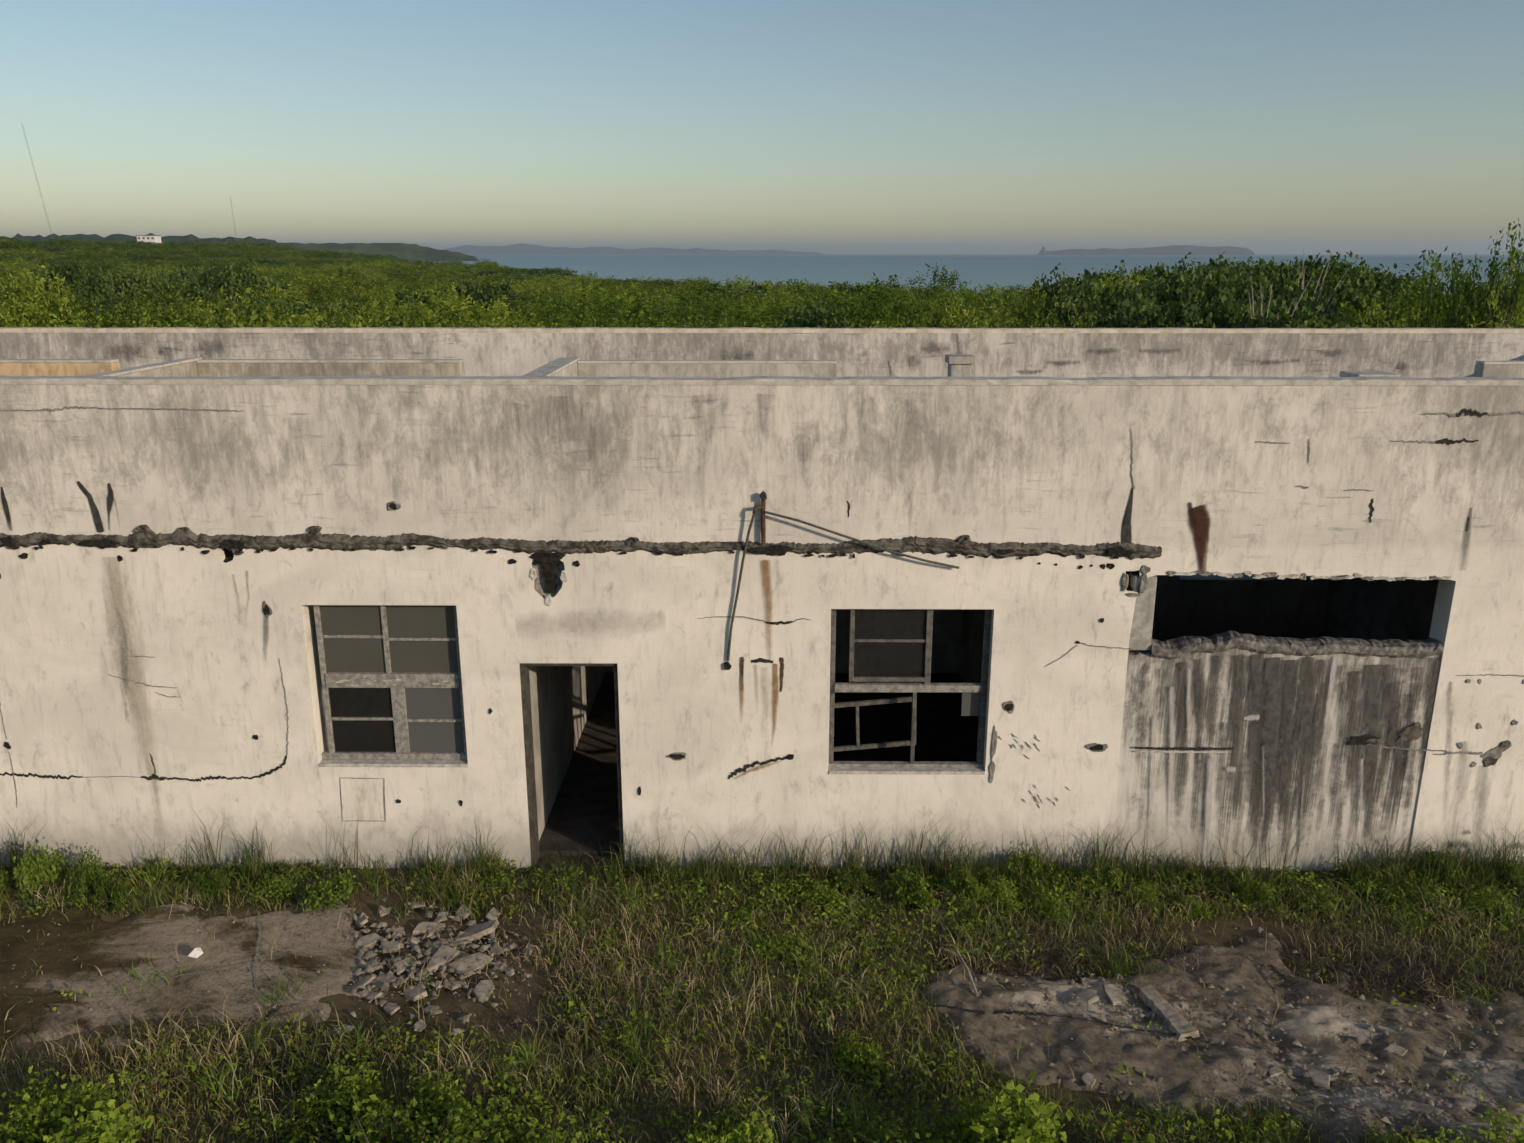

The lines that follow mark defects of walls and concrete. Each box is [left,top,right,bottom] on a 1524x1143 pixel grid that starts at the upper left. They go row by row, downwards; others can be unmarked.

crack [1389,408,1524,445]
spalling [0,525,1452,606]
corrosion [762,560,771,622]
corrosion [1189,502,1210,574]
crack [0,655,289,804]
corrosion [740,657,784,732]
damp [1138,654,1451,867]